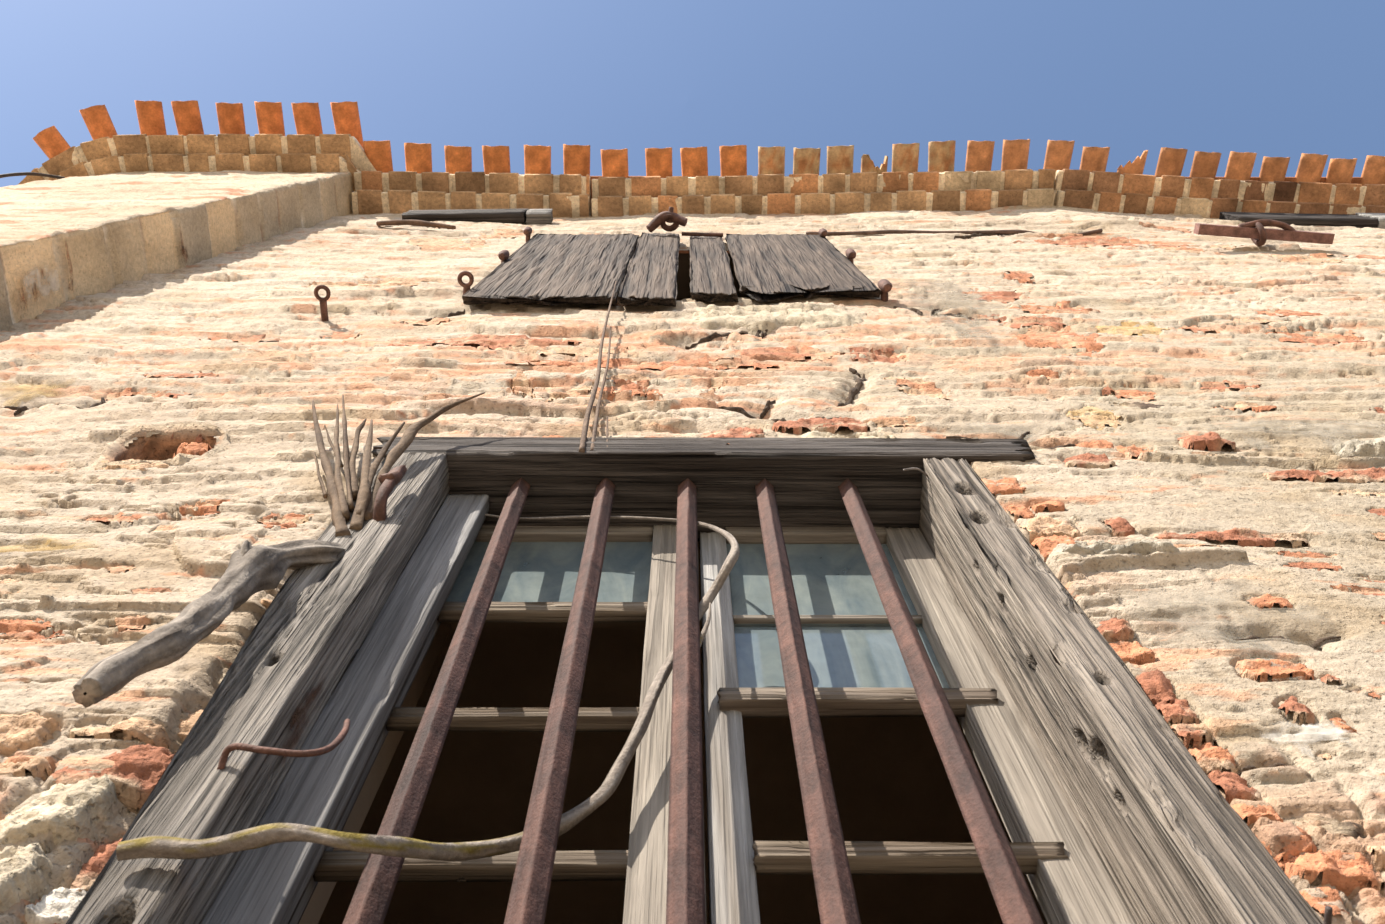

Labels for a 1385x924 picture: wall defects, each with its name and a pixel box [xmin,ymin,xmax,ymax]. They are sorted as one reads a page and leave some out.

flaking render [95,426,212,471]
spalling [1246,593,1294,611]
spalling [0,709,203,924]
spalling [1097,618,1385,916]